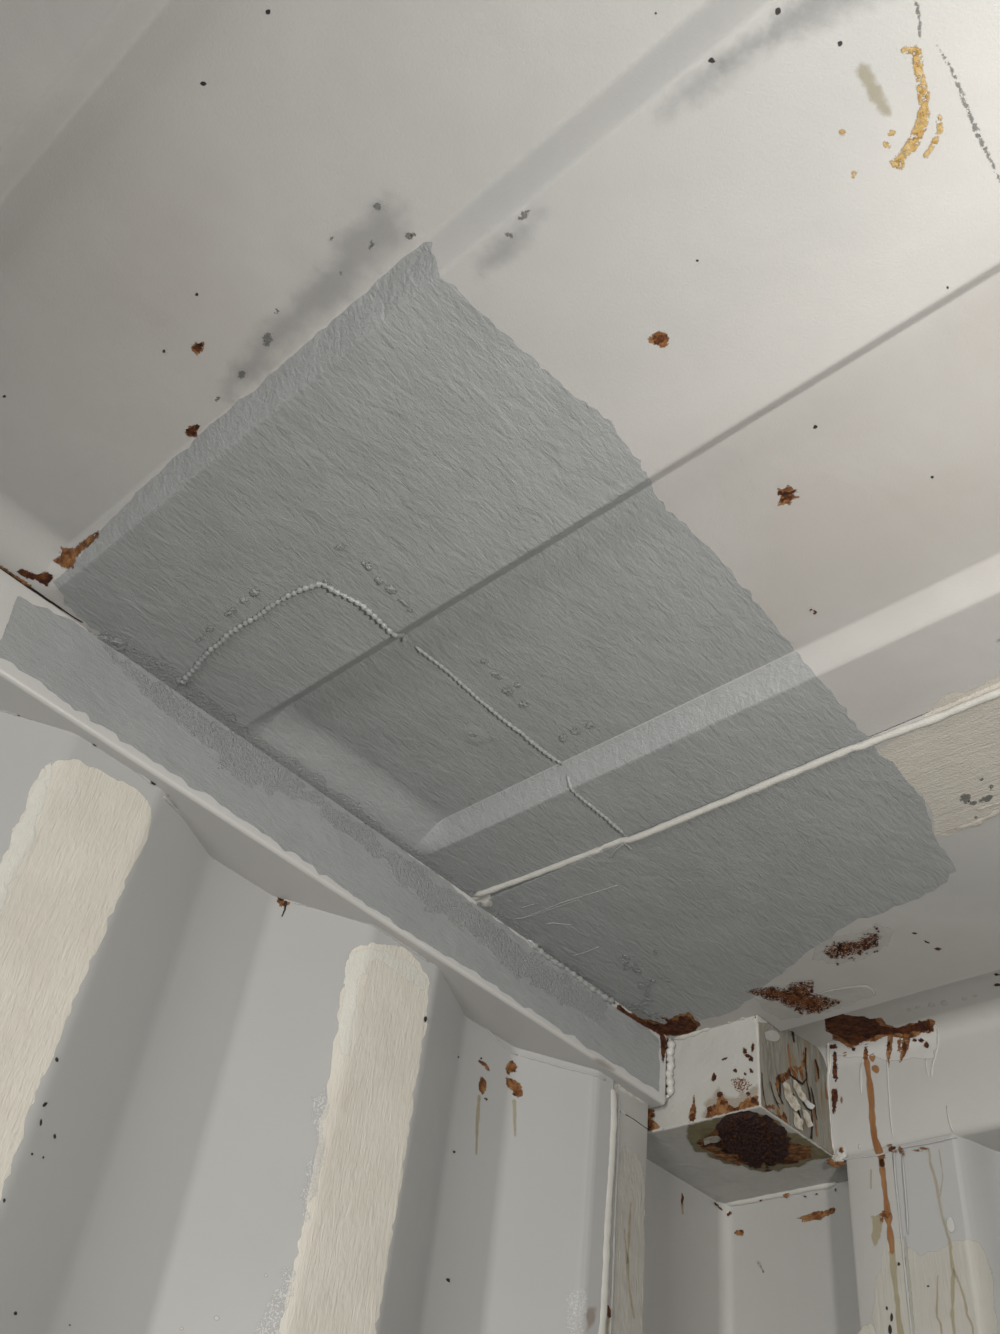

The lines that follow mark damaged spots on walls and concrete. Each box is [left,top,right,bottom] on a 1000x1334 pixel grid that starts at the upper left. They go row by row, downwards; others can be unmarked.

corrosion [17,531,99,586]
spalling [960,778,993,818]
corrosion [812,924,894,965]
corrosion [617,1005,701,1063]
corrosion [688,1043,846,1167]
corrosion [748,981,935,1254]